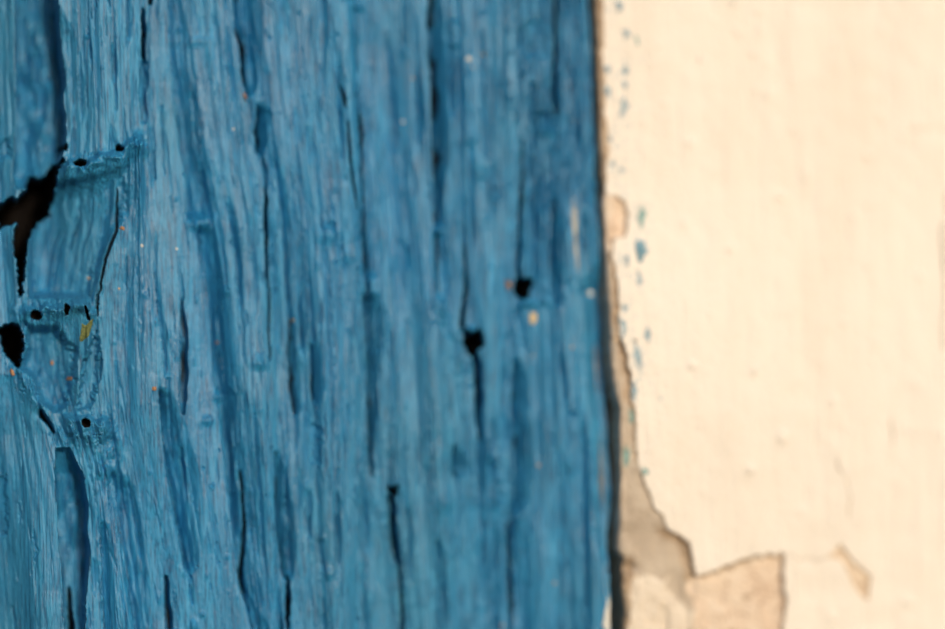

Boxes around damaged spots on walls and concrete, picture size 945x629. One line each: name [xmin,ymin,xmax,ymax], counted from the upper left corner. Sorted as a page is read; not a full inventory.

spalling [588,0,787,629]
peeling [828,545,871,601]